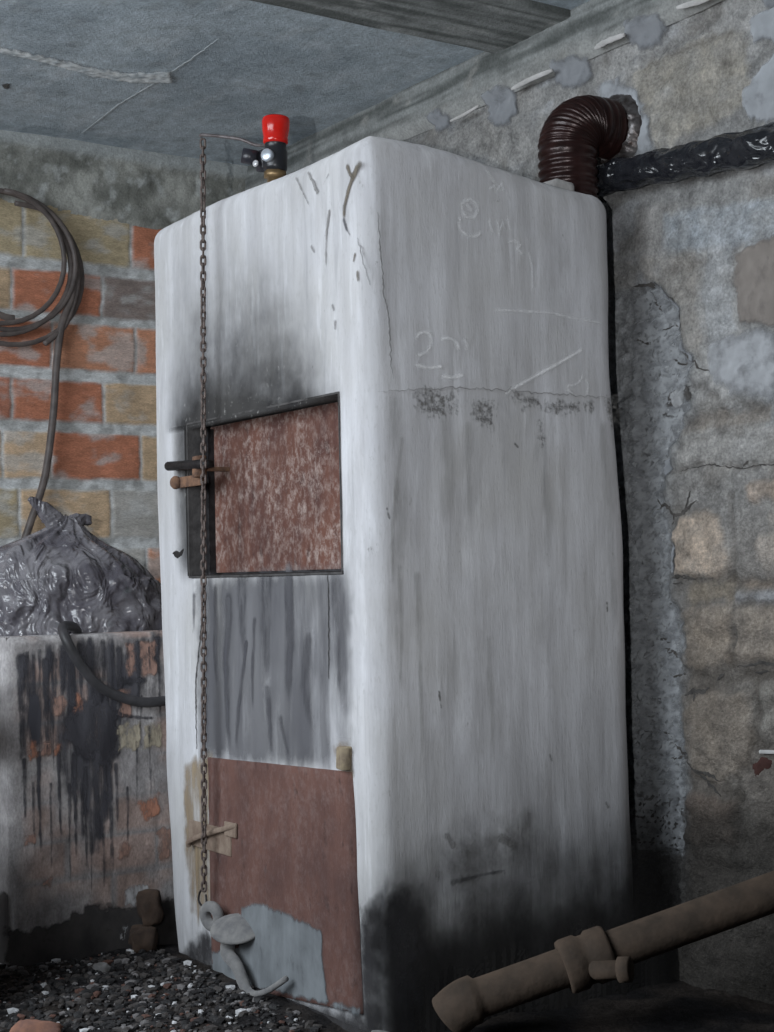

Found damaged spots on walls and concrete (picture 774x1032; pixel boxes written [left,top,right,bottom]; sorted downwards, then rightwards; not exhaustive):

crack [633,282,710,372]
crack [657,461,774,524]
crack [672,574,696,585]
leakage [213,576,270,736]
leakage [285,565,308,708]
crack [660,638,774,702]
leakage [266,687,286,747]
leakage [16,636,161,886]
spalling [753,757,772,776]